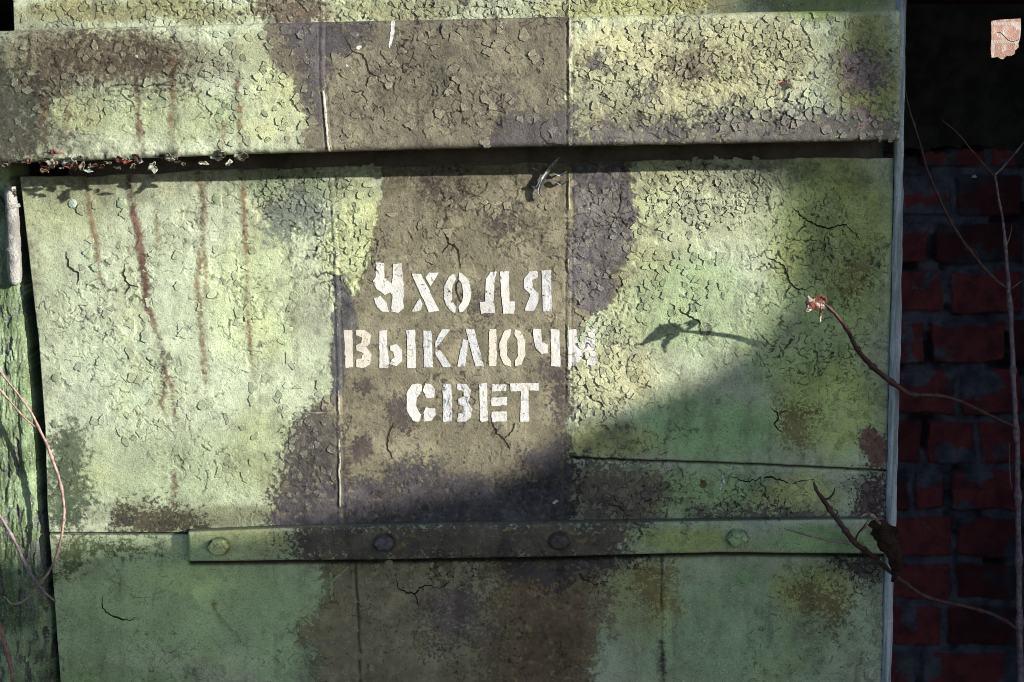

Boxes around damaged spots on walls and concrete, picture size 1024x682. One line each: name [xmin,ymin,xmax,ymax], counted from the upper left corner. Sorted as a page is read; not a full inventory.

corrosion [0,26,210,163]
corrosion [82,177,100,275]
corrosion [127,175,176,417]
corrosion [195,170,208,319]
corrosion [240,170,250,259]
peeling [0,0,901,520]
crack [769,258,810,299]
crack [792,207,861,264]
leakage [46,415,167,583]
crack [492,422,515,448]
crack [731,476,814,491]
crack [101,597,136,621]